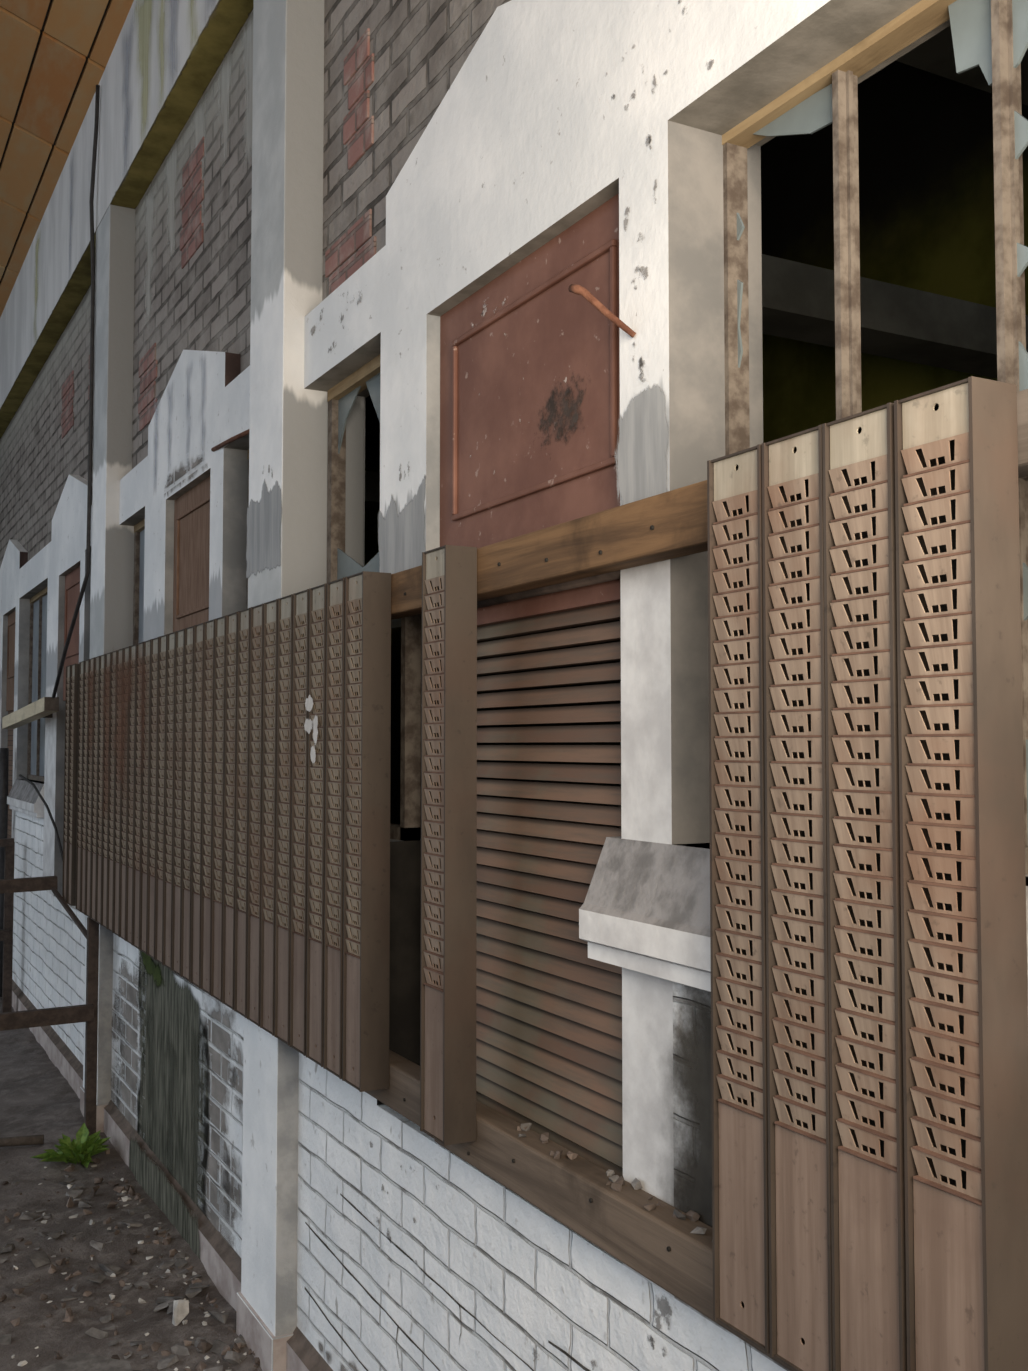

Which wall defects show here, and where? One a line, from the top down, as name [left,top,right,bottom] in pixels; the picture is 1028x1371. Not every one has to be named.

peeling [615,343,669,505]
damp [129,950,210,1259]
damp [673,996,712,1227]
crack [305,1222,440,1371]
crack [340,1193,590,1371]